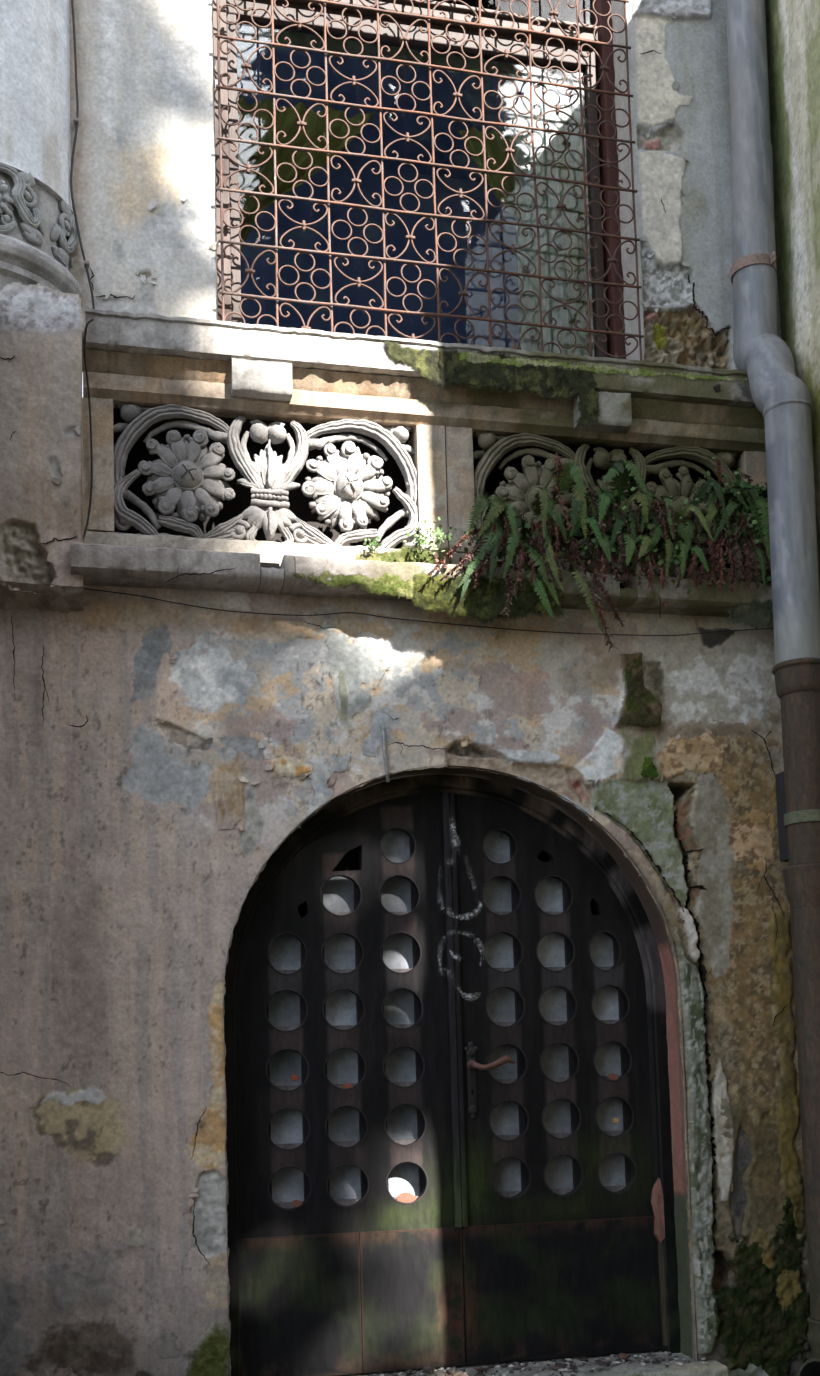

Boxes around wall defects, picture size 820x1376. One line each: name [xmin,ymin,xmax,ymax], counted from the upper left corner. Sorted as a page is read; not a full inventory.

peeling [634,12,732,393]
peeling [130,626,365,858]
peeling [311,617,391,719]
spalling [445,735,607,813]
peeling [656,728,728,963]
peeling [729,809,776,871]
crack [596,803,717,1246]
peeling [183,979,229,1314]
spalling [712,1123,752,1292]